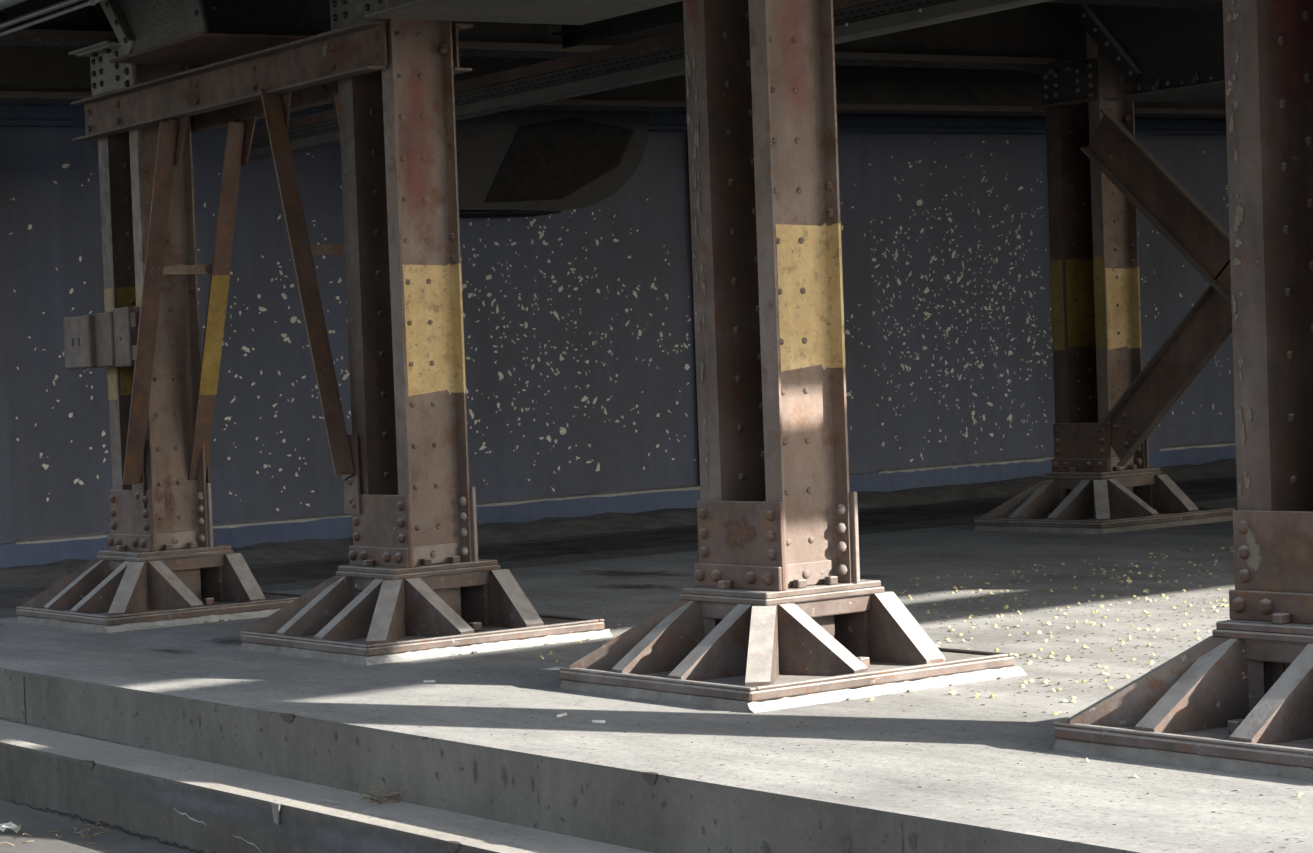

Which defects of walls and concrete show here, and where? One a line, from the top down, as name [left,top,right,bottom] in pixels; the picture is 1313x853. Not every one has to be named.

peeling [223,255,309,356]
peeling [229,370,319,492]
peeling [461,209,705,491]
peeling [845,141,1053,462]